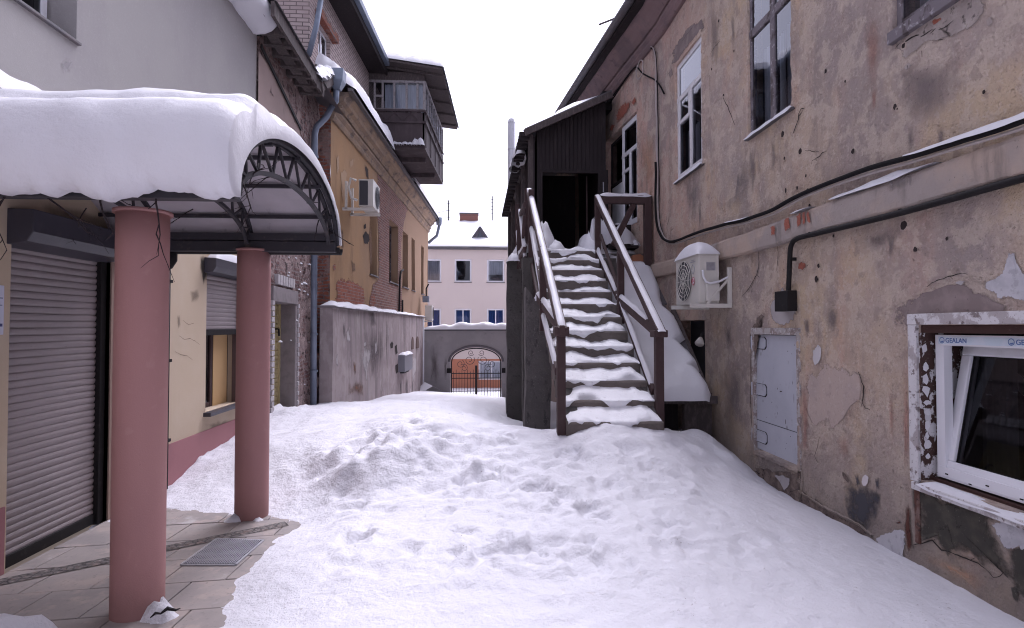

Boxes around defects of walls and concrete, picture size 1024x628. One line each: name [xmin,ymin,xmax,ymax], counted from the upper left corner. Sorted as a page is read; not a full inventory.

flaking render [897,0,993,70]
flaking render [333,173,408,312]
flaking render [888,277,1005,326]
peeling [922,344,932,459]
leakage [847,475,879,527]